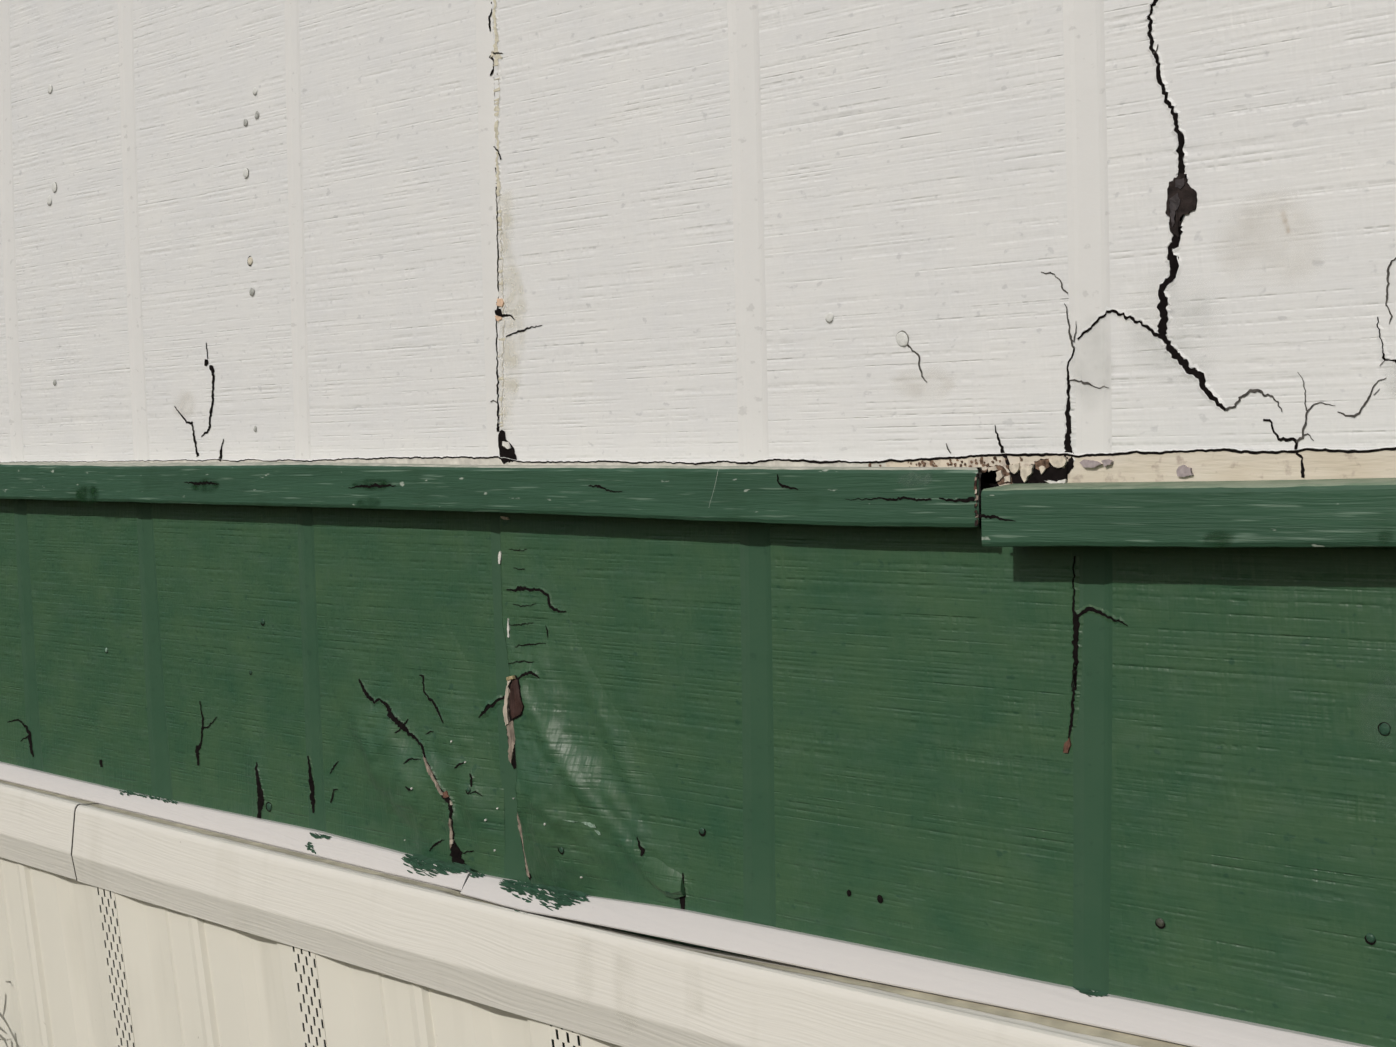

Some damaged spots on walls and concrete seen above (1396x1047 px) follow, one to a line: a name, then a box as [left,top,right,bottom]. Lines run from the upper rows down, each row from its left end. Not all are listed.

crack [488,2,502,76]
crack [490,146,542,432]
peeling [0,0,1396,526]
crack [1041,0,1396,478]
crack [174,343,224,485]
crack [506,584,567,615]
crack [1066,556,1128,738]
crack [195,701,217,766]
crack [254,762,266,819]
crack [307,756,316,813]
crack [358,673,466,864]
spalling [506,675,524,769]